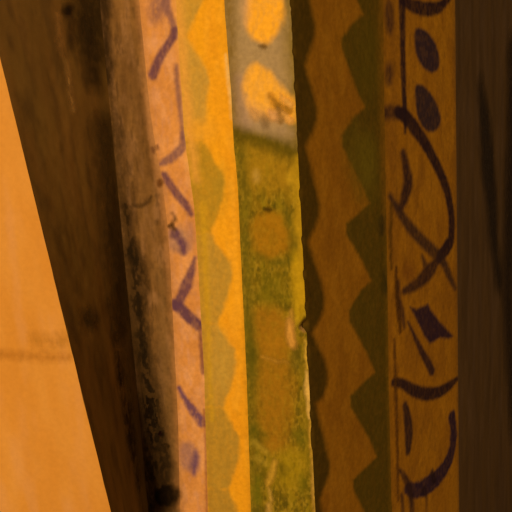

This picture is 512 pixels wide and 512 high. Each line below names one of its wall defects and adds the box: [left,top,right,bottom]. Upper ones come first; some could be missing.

damp [127,238,171,512]